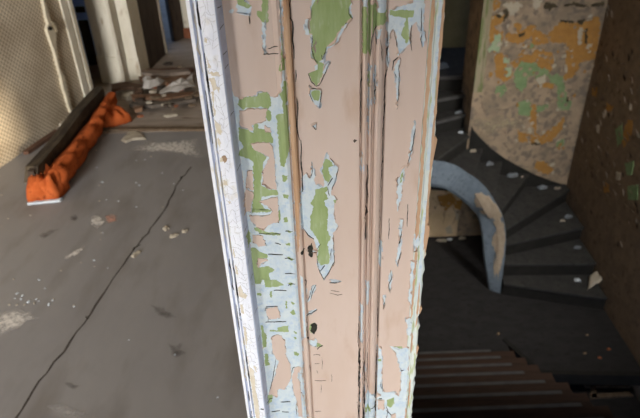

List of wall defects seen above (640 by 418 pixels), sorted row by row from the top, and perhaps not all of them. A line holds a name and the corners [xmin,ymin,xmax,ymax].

peeling [303,0,353,109]
peeling [488,0,604,149]
crack [15,167,191,418]
peeling [229,0,342,418]
peeling [359,0,462,418]
peeling [474,192,505,279]